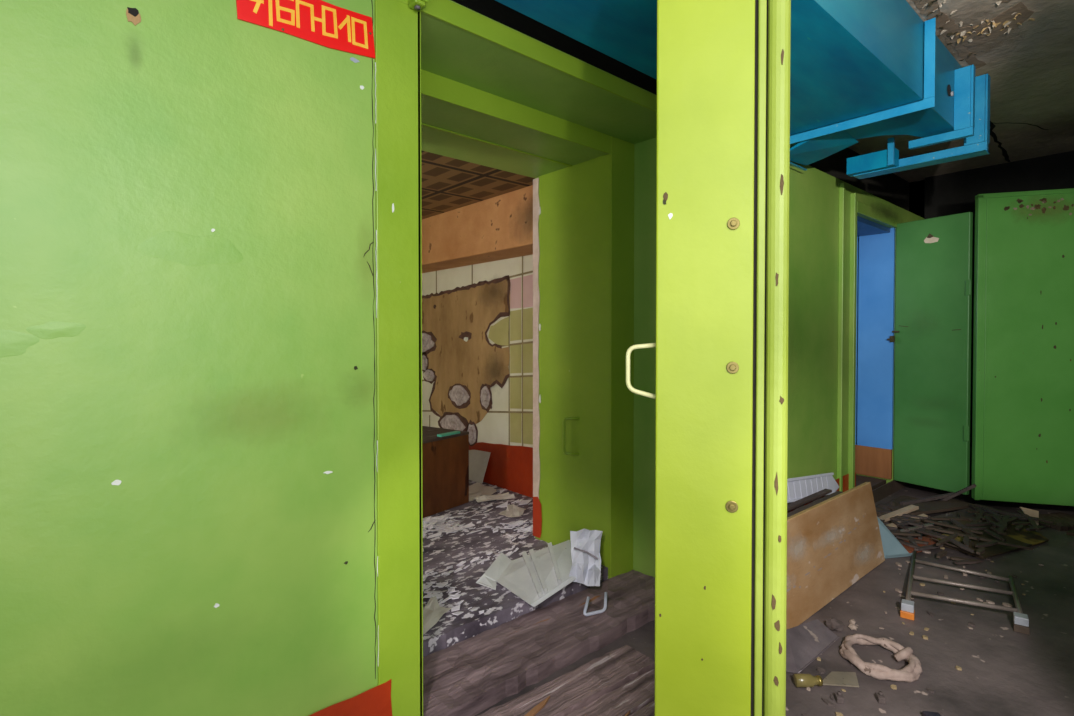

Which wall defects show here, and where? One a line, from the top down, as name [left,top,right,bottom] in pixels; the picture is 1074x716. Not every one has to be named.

spalling [126,7,141,26]
peeling [912,0,1035,69]
crack [990,121,1048,162]
spalling [422,275,510,349]